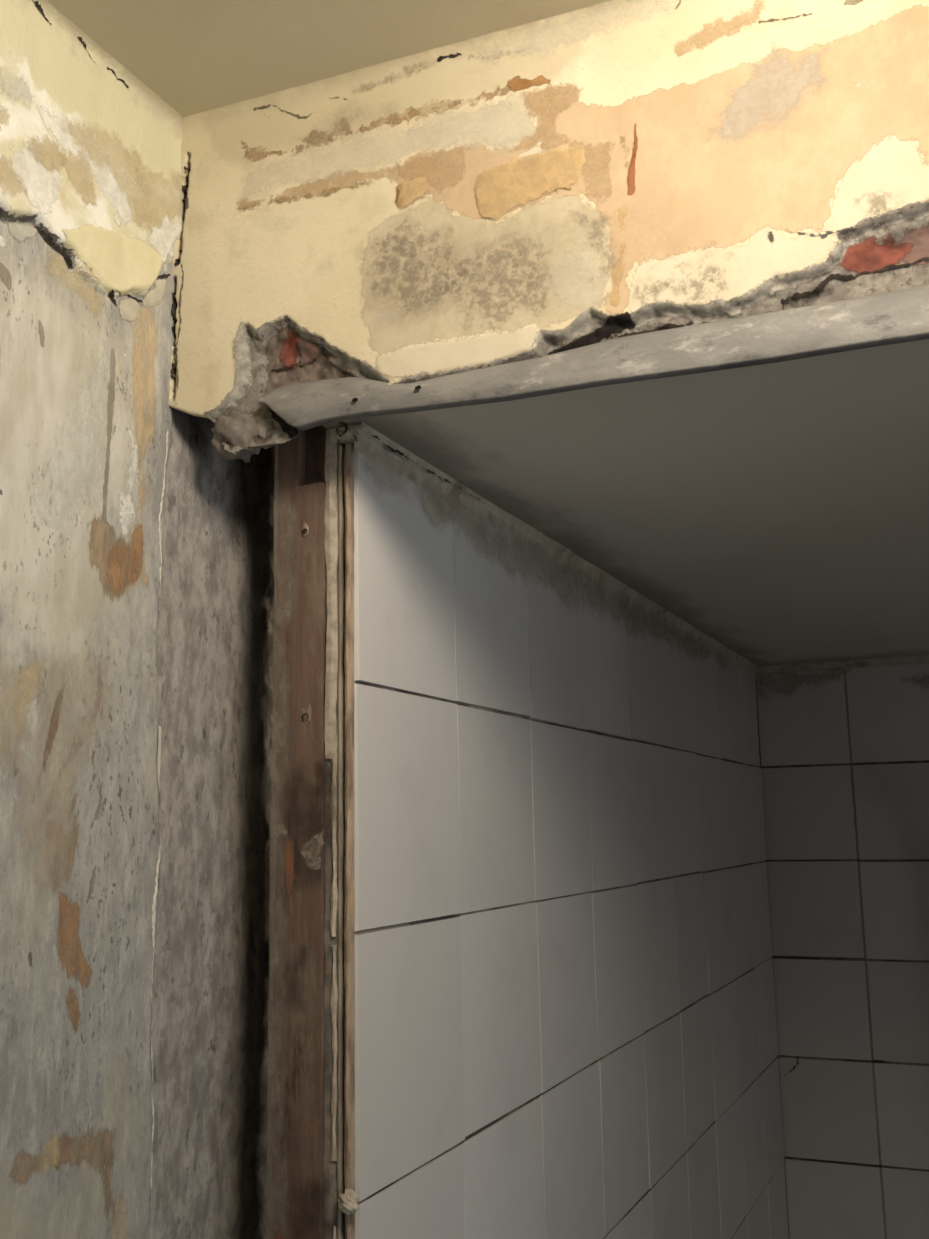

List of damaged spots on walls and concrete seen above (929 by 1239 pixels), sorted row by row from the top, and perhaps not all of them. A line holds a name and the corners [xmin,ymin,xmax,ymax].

crack [0,207,75,269]
peeling [0,72,186,322]
crack [170,152,191,404]
crack [254,97,347,119]
water stain [361,195,611,355]
peeling [204,4,929,463]
rust [621,124,638,195]
flaking render [324,428,339,1161]